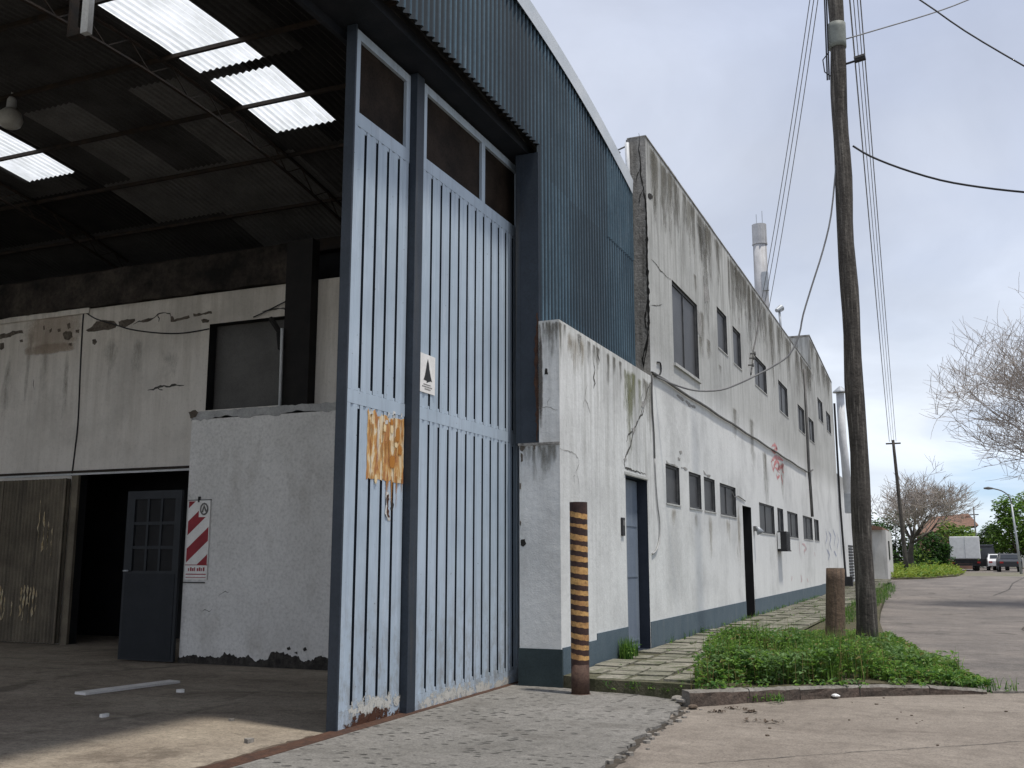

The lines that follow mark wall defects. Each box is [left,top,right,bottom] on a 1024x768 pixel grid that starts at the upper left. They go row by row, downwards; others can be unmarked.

damp [651,151,830,392]
spalling [171,311,212,323]
crack [624,138,669,474]
spalling [0,330,23,350]
crack [149,383,184,391]
damp [538,322,565,418]
damp [578,334,651,416]
spalling [178,646,328,670]
rust [344,706,400,728]